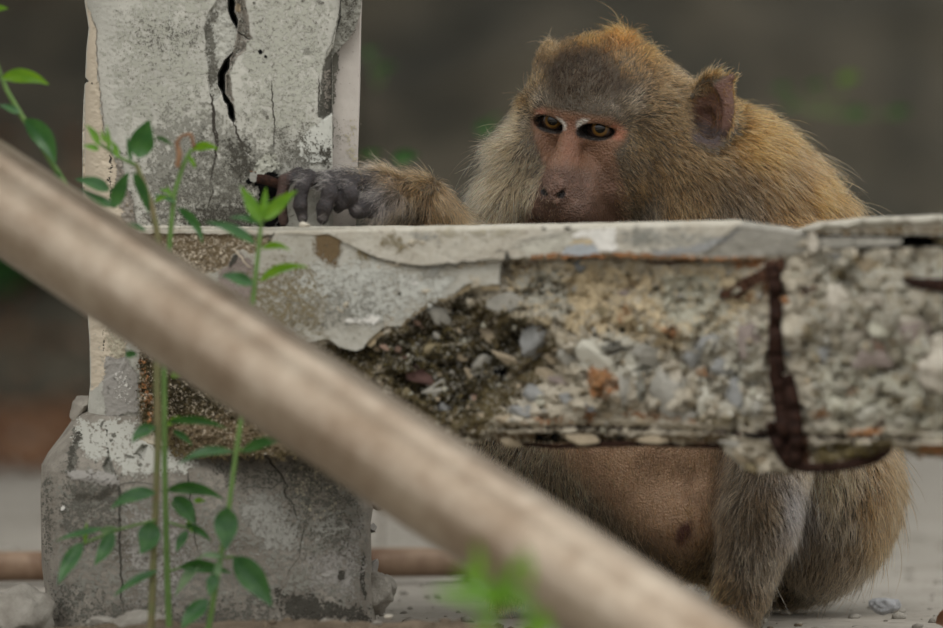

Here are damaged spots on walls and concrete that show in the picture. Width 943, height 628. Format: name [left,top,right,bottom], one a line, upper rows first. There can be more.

crack [85,6,113,200]
crack [207,0,252,208]
crack [269,80,277,148]
crack [318,6,341,112]
spalling [276,214,943,474]